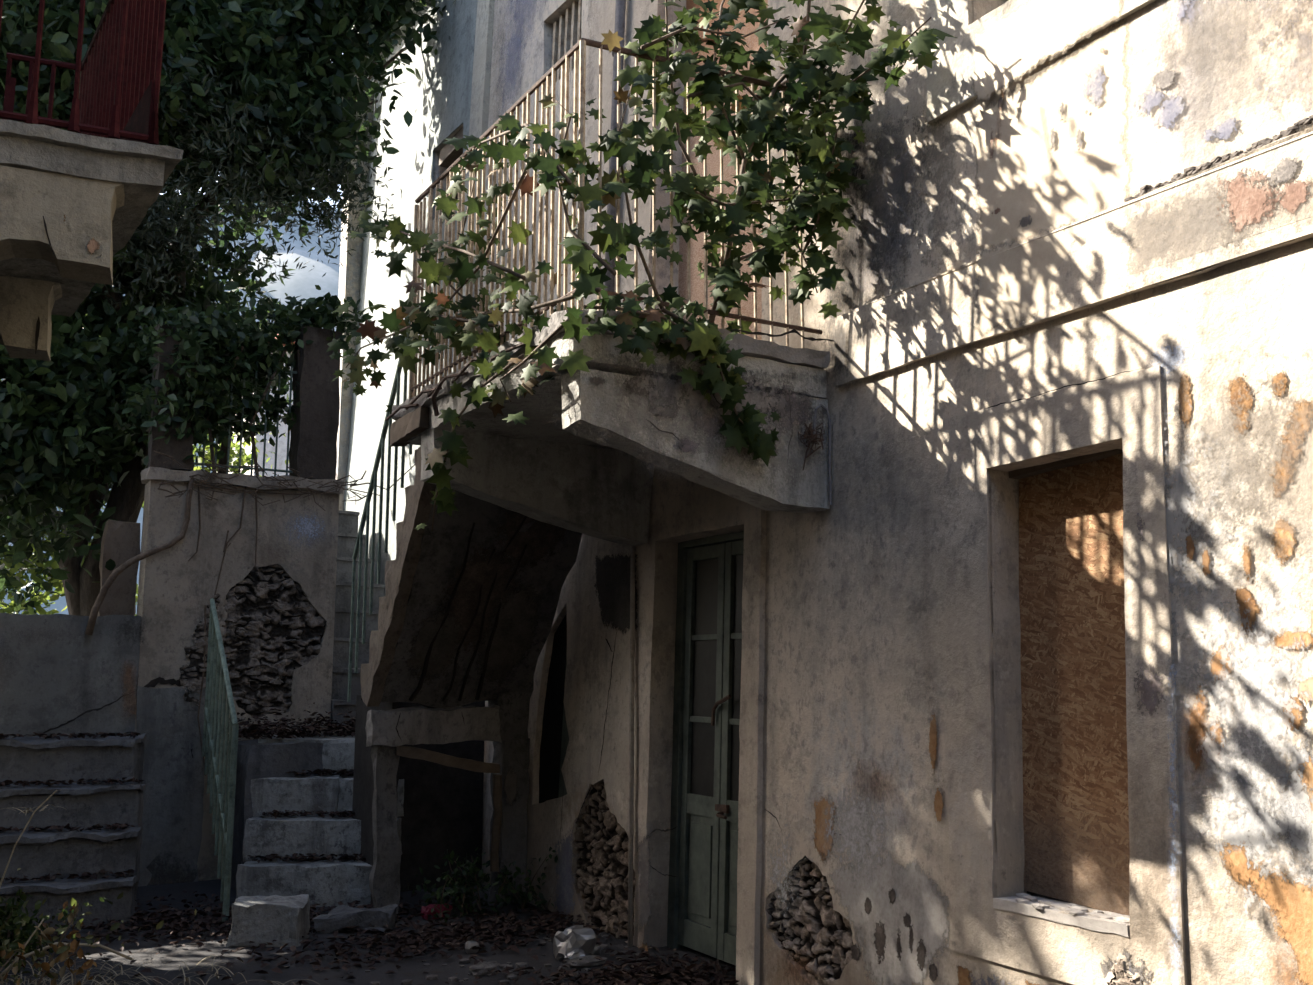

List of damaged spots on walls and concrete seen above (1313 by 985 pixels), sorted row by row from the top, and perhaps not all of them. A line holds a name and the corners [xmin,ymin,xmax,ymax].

peeling [1124,115,1313,235]
peeling [1178,374,1193,426]
peeling [1228,374,1254,435]
peeling [1265,370,1313,499]
flaking render [176,563,326,720]
peeling [594,551,639,635]
peeling [1235,544,1260,644]
peeling [1272,609,1313,650]
peeling [1187,645,1234,772]
flaking render [400,782,675,985]
peeling [763,797,950,985]
peeling [1219,841,1313,985]